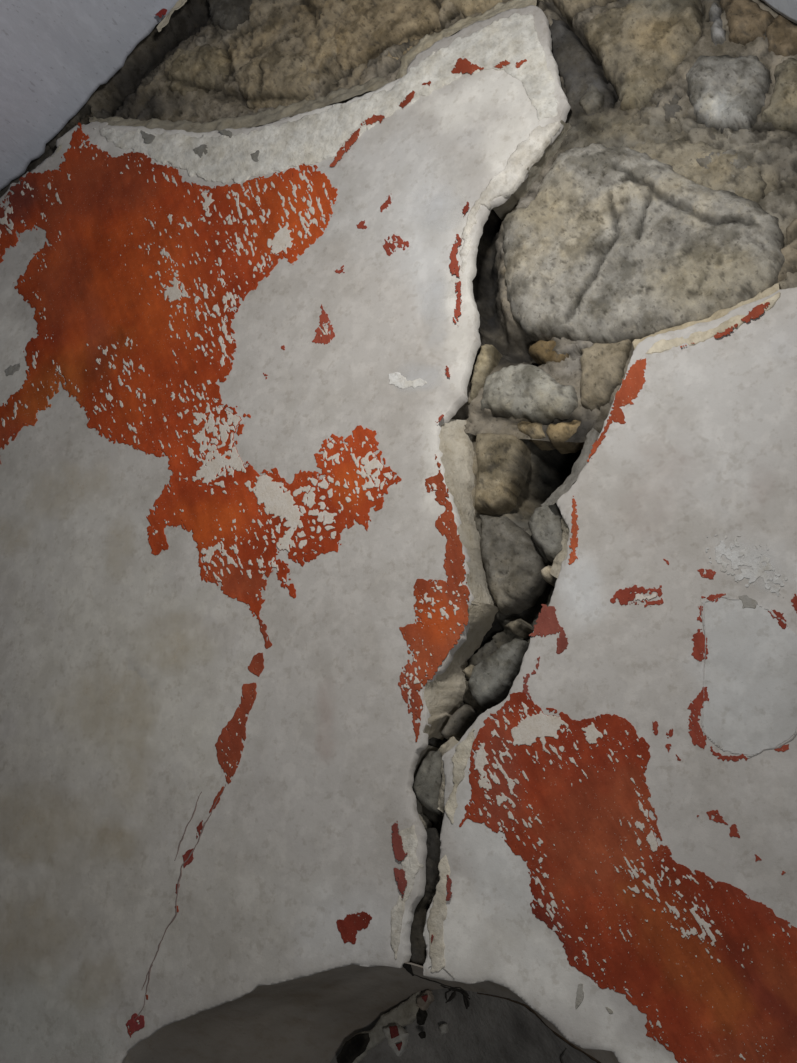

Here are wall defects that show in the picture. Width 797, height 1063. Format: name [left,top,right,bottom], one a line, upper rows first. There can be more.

flaking render [0,0,797,813]
crack [390,419,601,1063]
peeling [182,820,203,868]
peeling [391,821,407,898]
peeling [126,1013,145,1038]